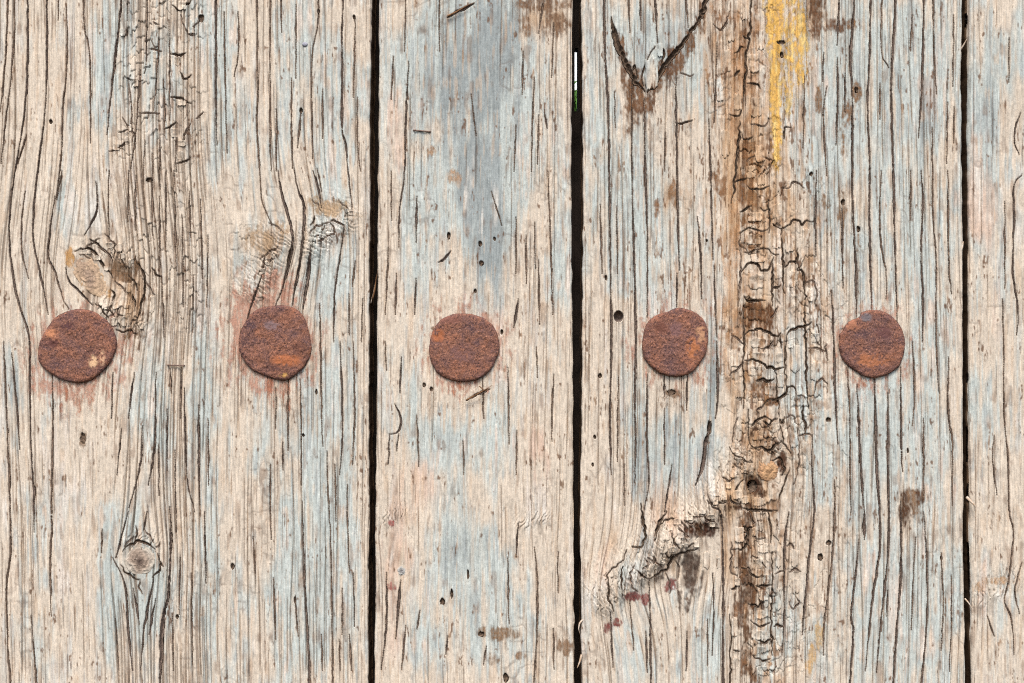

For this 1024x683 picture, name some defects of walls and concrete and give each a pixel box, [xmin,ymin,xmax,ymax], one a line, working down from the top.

corrosion [28,311,133,410]
crack [0,0,420,683]
corrosion [216,269,320,409]
crack [600,0,955,683]